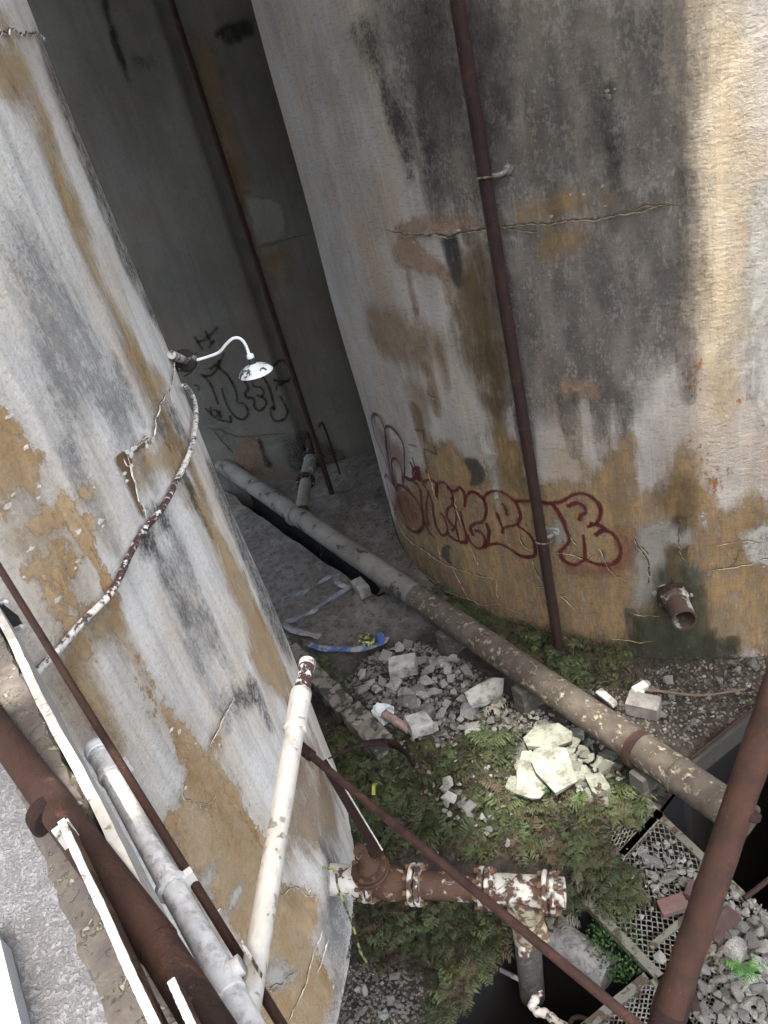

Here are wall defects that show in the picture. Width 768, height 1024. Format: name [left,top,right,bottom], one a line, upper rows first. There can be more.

water stain [351,0,510,426]
crack [378,203,692,239]
water stain [465,0,768,445]
crack [123,361,177,520]
peeling [0,406,122,663]
crack [389,464,536,623]
peeling [393,422,768,655]
crack [519,530,652,616]
water stain [566,483,736,661]
crack [678,520,768,573]
peeling [135,656,265,944]
peeling [267,957,299,988]